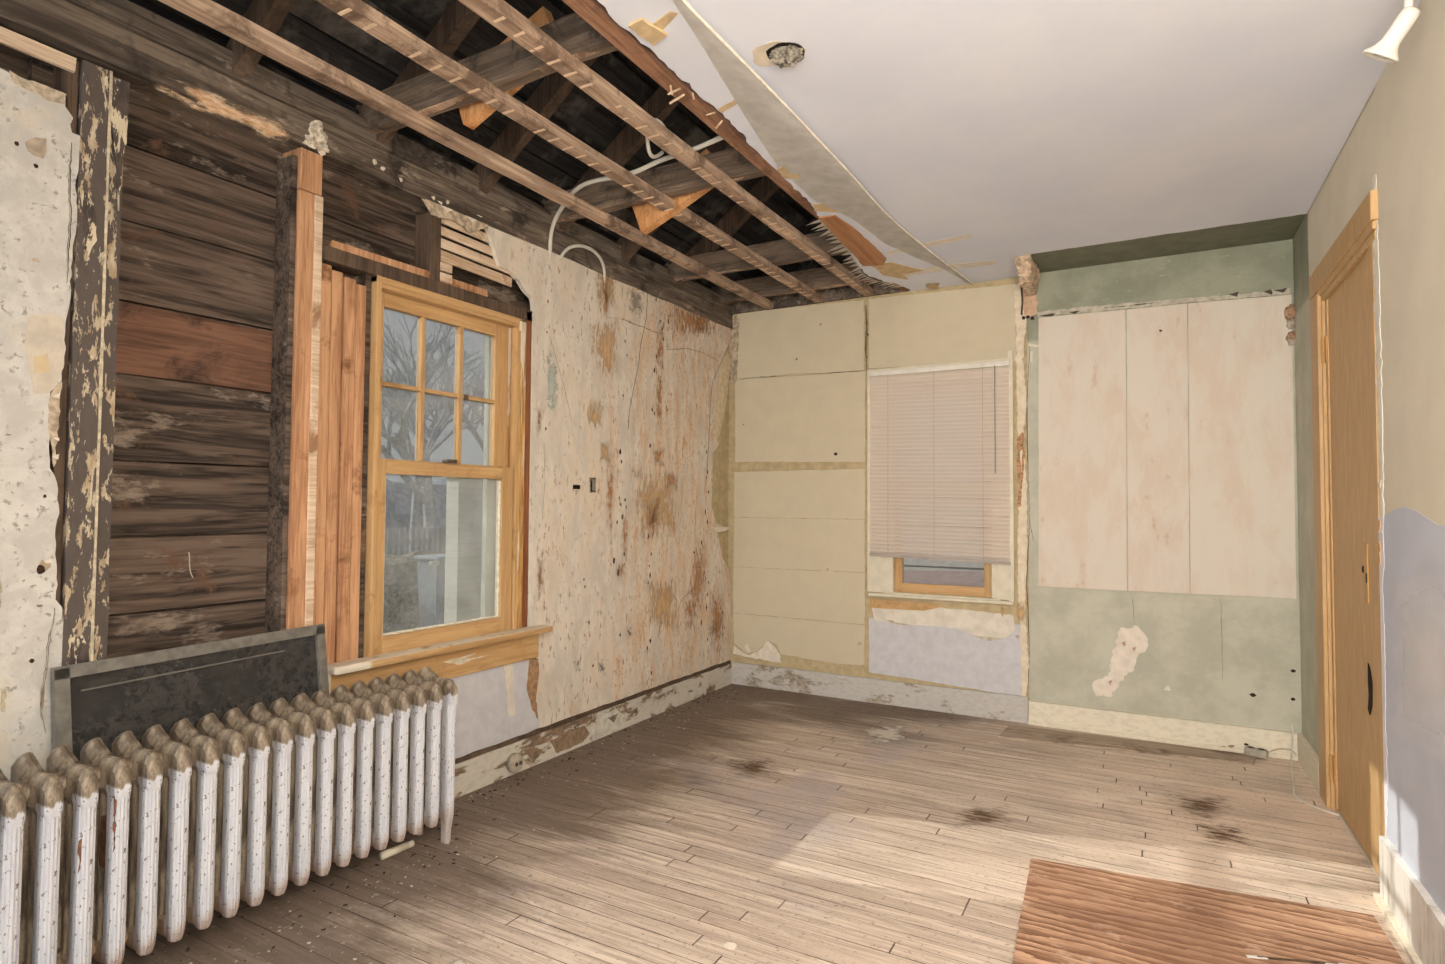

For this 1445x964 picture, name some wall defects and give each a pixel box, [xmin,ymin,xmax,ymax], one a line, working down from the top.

water stain [649,581,677,625]
flaking render [503,655,539,719]
peeling [1092,625,1148,697]